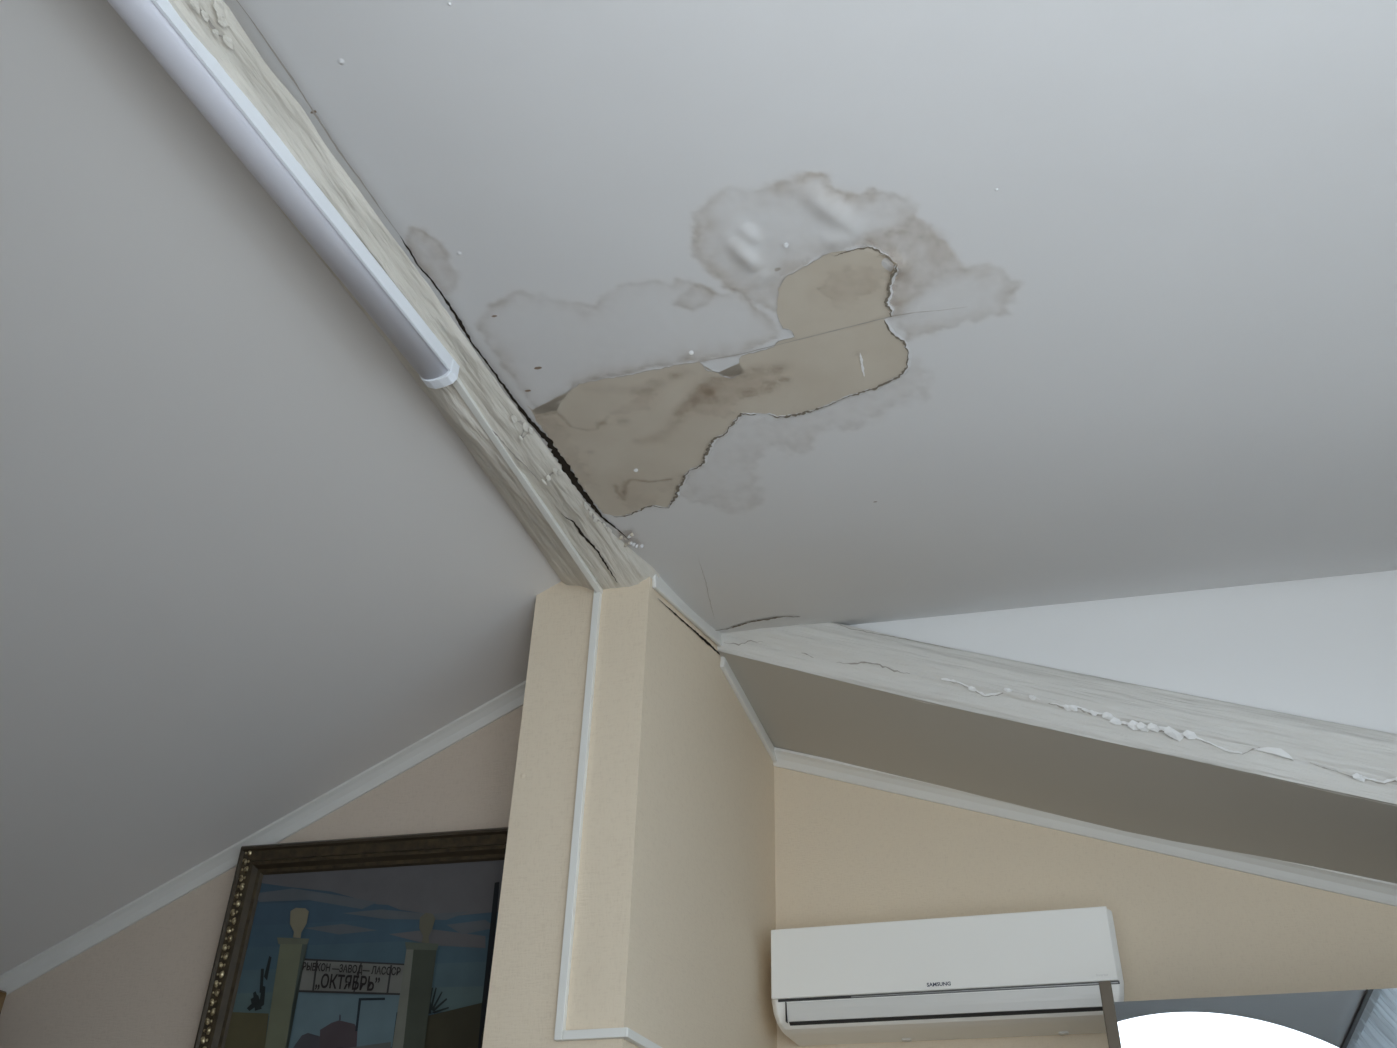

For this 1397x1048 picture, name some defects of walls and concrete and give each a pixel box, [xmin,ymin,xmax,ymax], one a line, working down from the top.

peeling [511,243,912,549]
crack [493,431,537,478]
crack [563,515,617,582]